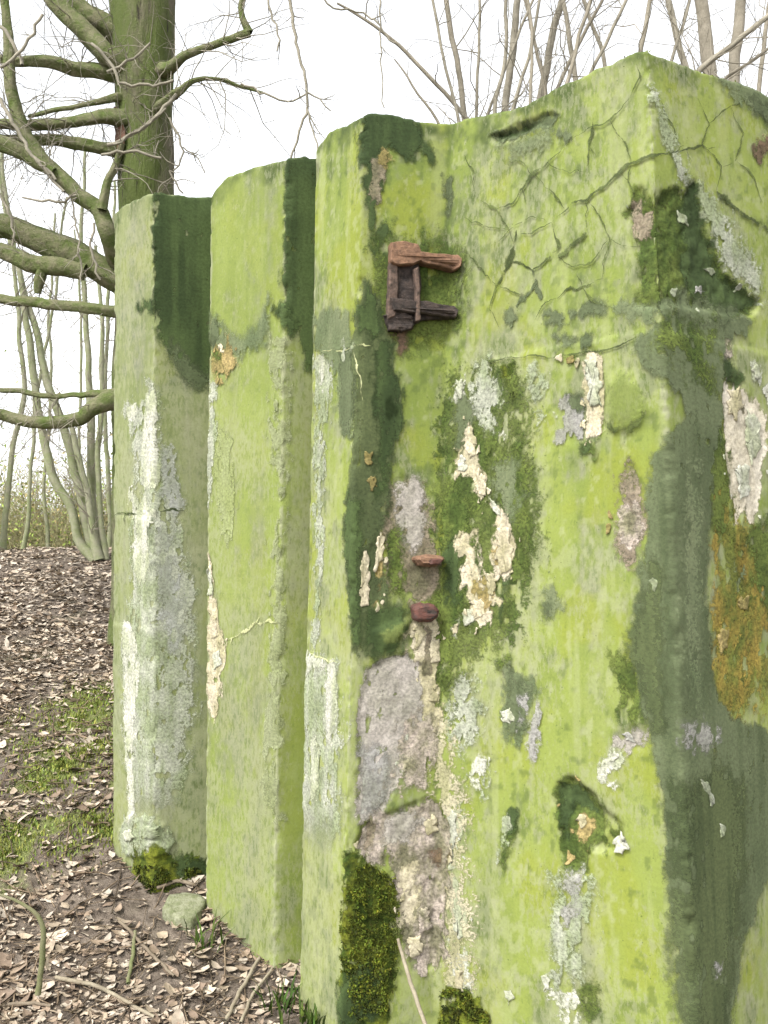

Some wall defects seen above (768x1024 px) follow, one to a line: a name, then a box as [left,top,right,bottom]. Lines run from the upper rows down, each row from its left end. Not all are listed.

peeling [119,377,228,857]
corrosion [368,228,471,359]
spalling [302,351,543,993]
peeling [526,352,604,446]
crack [458,63,768,327]
spalling [606,457,649,570]
spalling [622,84,768,524]